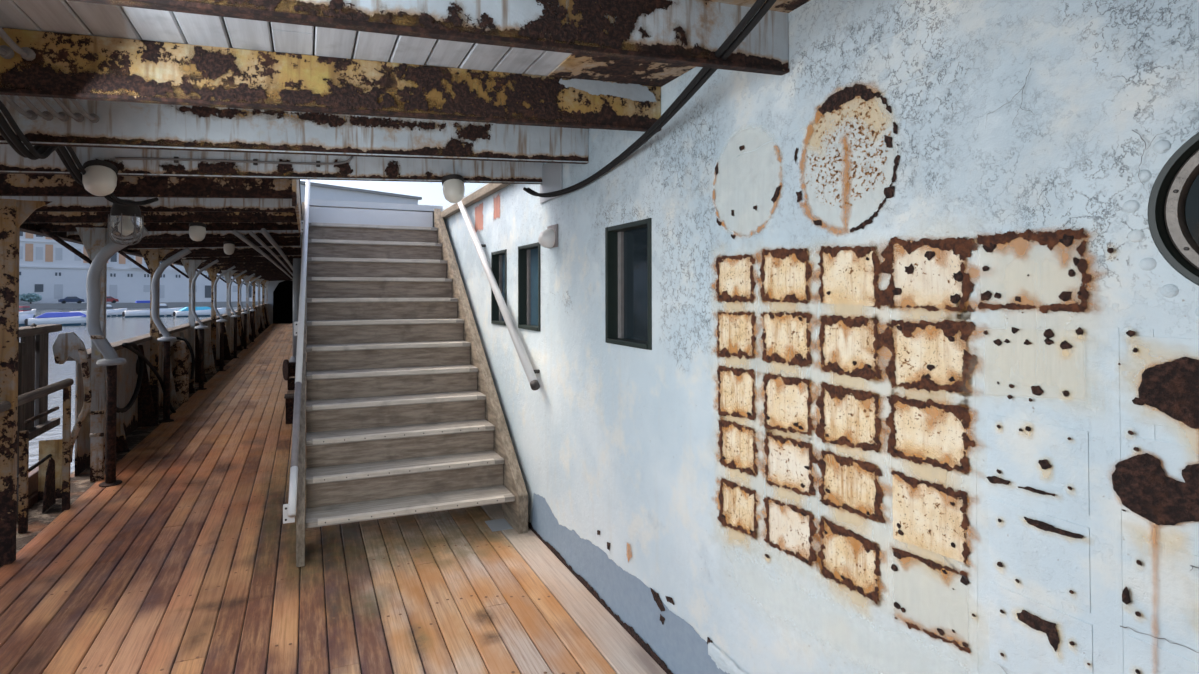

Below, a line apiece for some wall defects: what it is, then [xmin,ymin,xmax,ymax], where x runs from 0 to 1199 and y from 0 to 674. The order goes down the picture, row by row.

corrosion [212,0,673,51]
corrosion [673,25,709,59]
corrosion [1,46,578,159]
corrosion [47,135,294,176]
corrosion [334,159,353,178]
corrosion [385,160,400,179]
corrosion [713,162,782,239]
corrosion [774,83,900,234]
corrosion [1132,357,1199,429]
corrosion [1112,453,1199,544]
peeling [531,493,747,674]